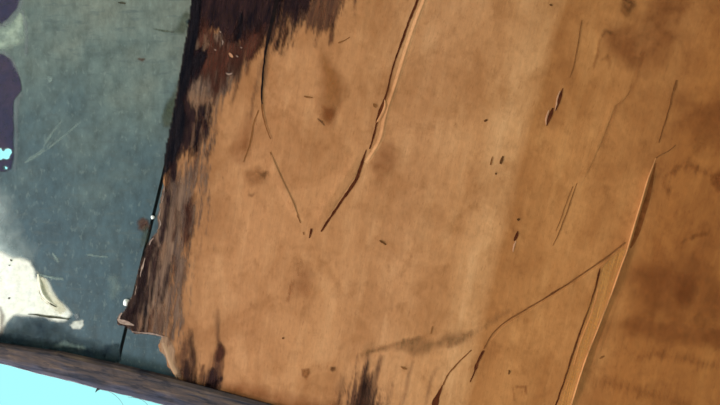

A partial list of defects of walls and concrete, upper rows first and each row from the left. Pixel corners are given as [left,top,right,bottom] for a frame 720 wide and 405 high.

peeling [160,341,180,378]
water stain [117,0,344,390]
crack [243,0,427,238]
water stain [347,351,380,405]
crack [432,80,678,405]